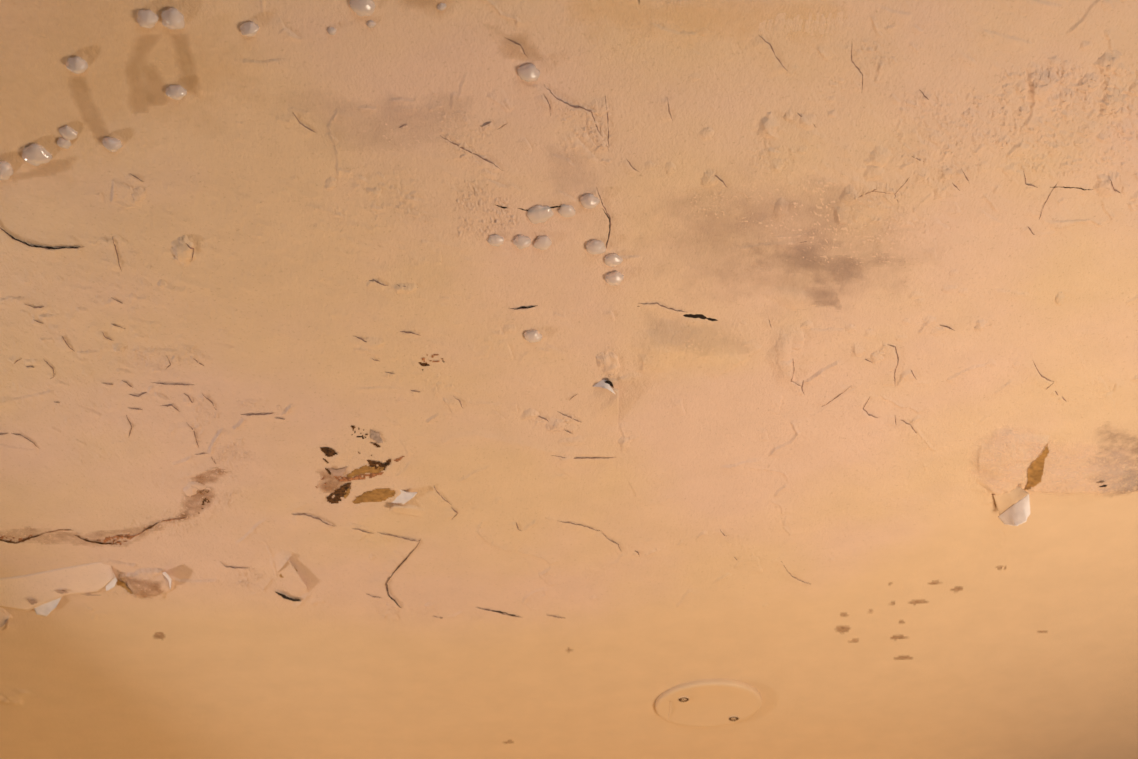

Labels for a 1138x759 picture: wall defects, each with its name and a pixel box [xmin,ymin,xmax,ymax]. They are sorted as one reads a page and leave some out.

spalling [304,426,426,518]
peeling [348,528,441,622]